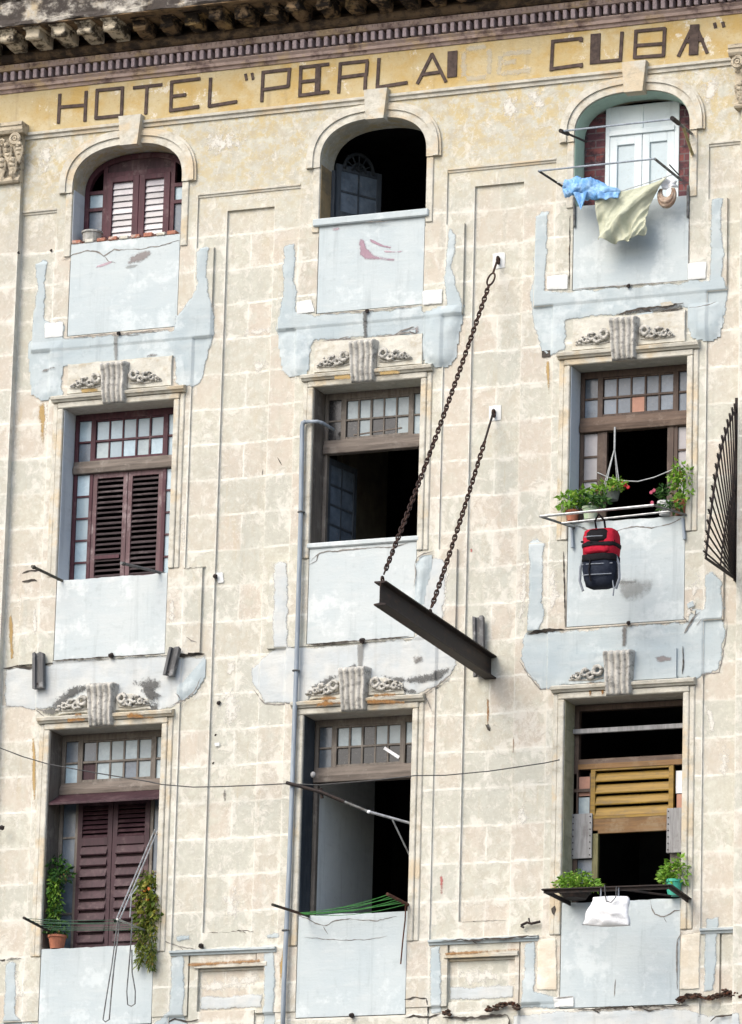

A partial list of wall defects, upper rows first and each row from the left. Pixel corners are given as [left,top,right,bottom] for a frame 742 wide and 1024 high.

flaking render [584,114,606,183]
crack [64,240,180,263]
spalling [625,301,681,315]
damp [133,679,161,710]
crack [301,916,396,941]